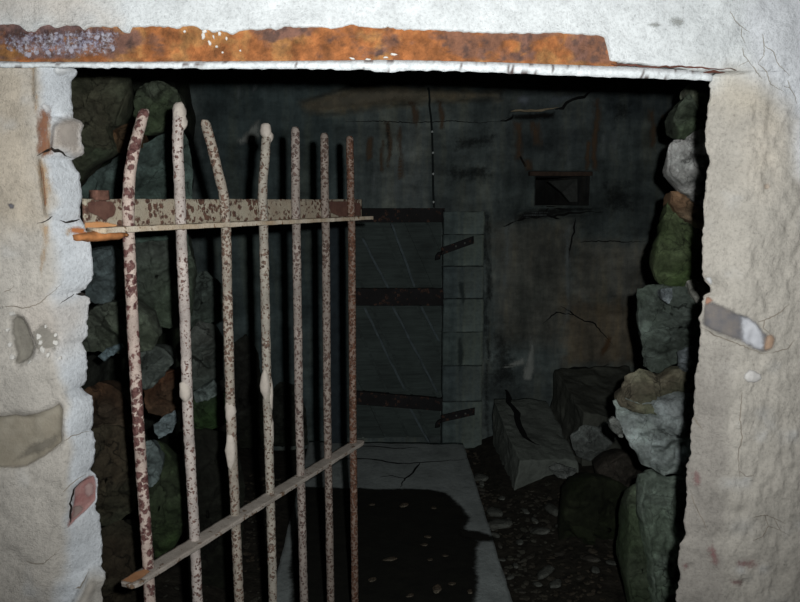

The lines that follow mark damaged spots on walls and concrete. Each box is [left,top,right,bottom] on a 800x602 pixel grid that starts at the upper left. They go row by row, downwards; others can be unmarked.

crack [612,11,797,104]
crack [555,91,592,110]
crack [37,147,71,158]
spalling [5,312,62,364]
crack [545,306,611,343]
spalling [703,297,775,354]
crack [342,446,467,485]
spalling [69,476,96,525]